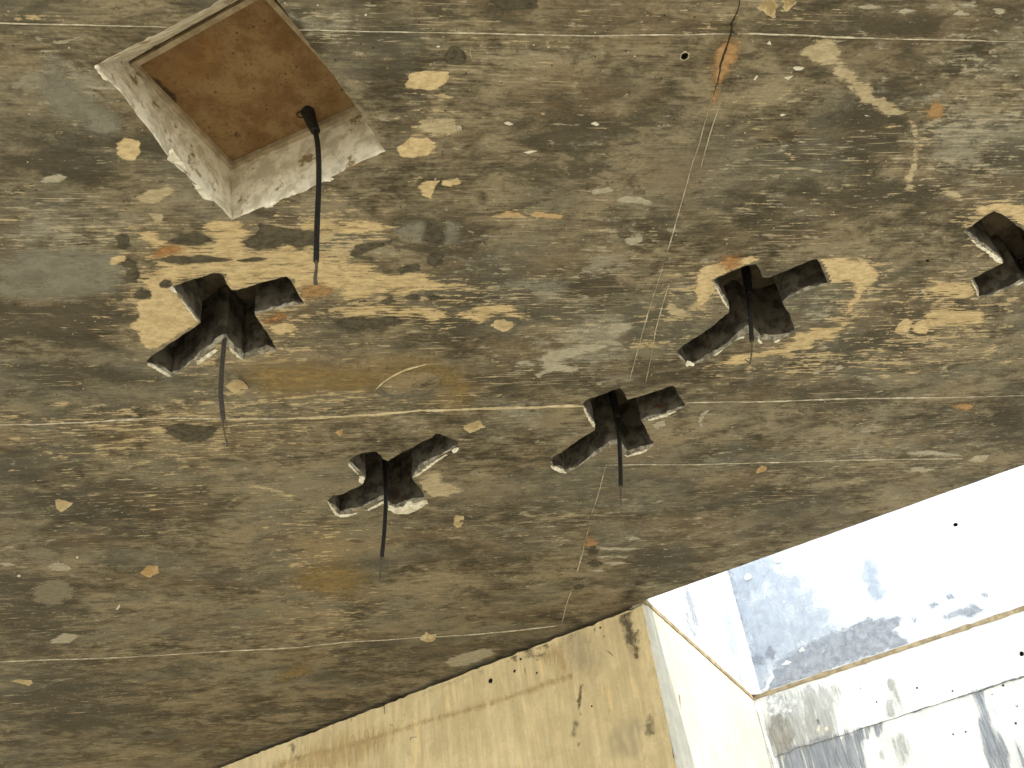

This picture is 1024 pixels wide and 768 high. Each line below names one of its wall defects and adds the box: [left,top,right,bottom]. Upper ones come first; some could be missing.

corrosion [712,38,739,103]
crack [666,0,743,265]
peeling [799,38,919,192]
spalling [167,147,213,201]
peeling [974,201,1024,226]
peeling [129,184,530,350]
peeling [664,256,758,317]
peeling [714,257,880,368]
spalling [971,240,1002,263]
spalling [197,348,243,364]
peeling [328,448,463,518]
water stain [722,557,908,768]